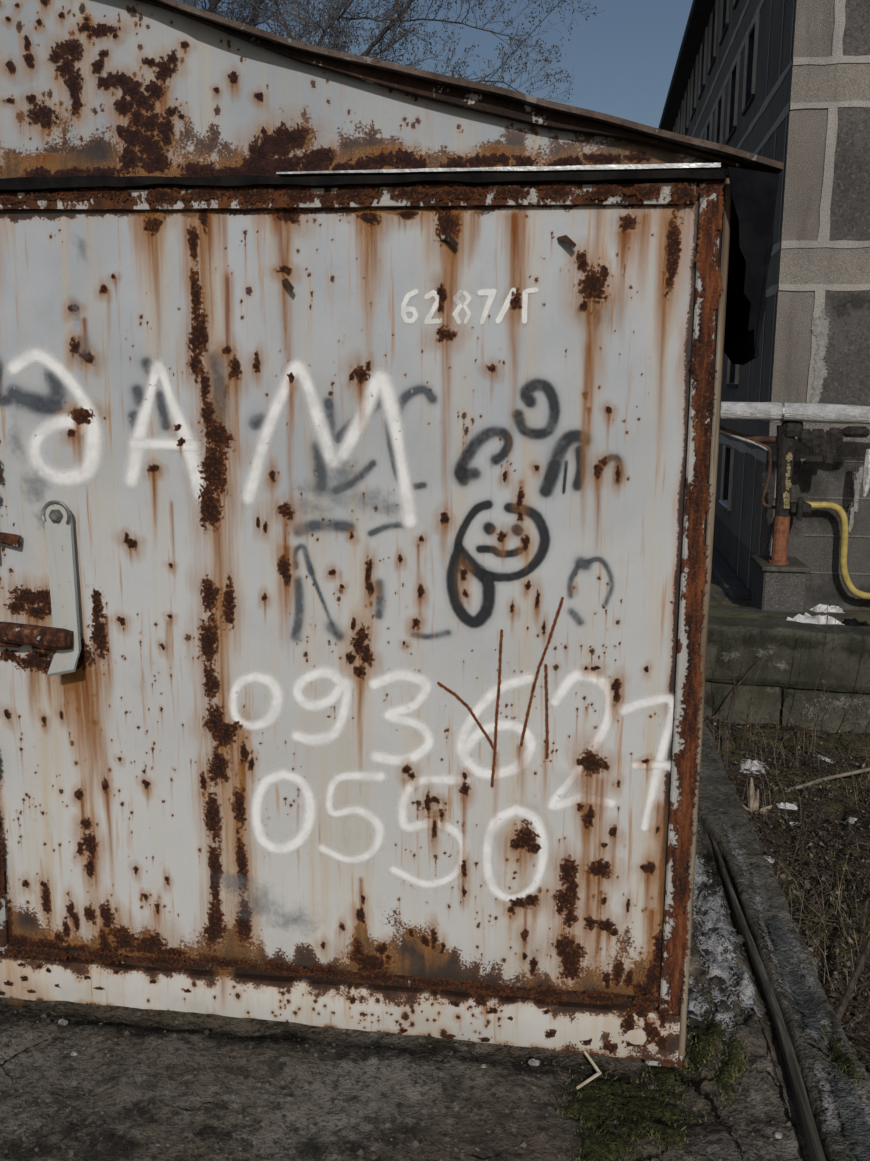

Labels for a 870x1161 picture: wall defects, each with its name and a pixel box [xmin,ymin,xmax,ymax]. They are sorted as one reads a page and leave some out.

corrosion [5,35,34,74]
corrosion [213,71,239,94]
corrosion [3,94,59,131]
corrosion [0,118,727,1056]
crack [596,1115,683,1161]
crack [679,1076,743,1160]